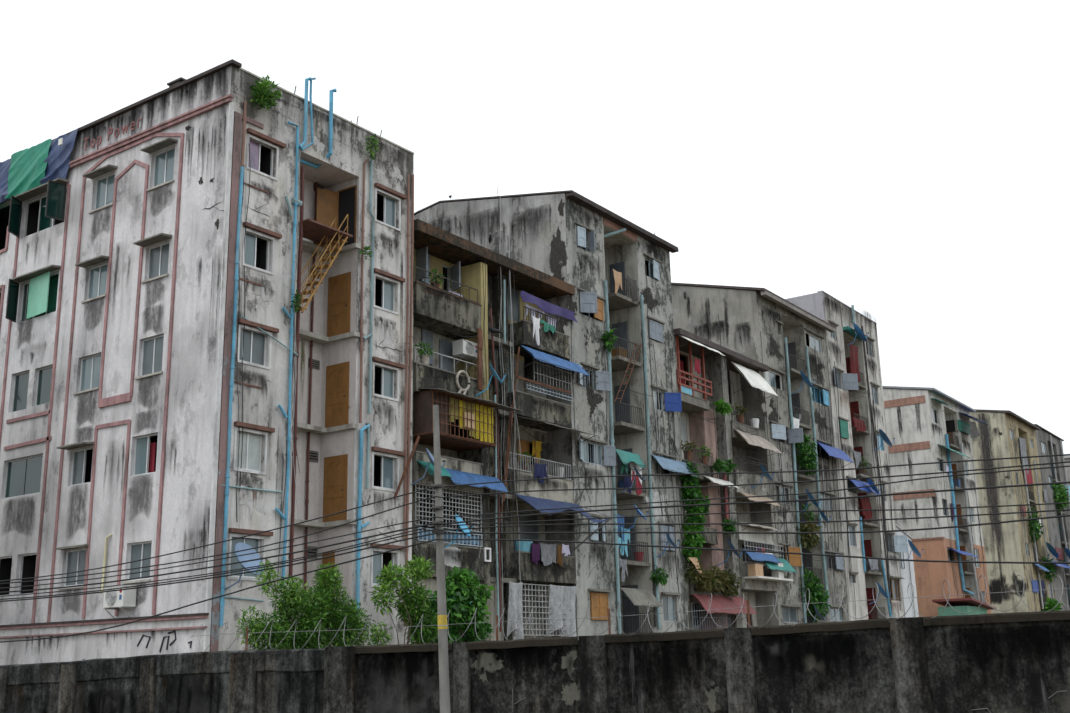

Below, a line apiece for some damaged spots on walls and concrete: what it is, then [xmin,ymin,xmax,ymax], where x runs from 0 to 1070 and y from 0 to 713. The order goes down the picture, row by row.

damp [83,96,166,146]
damp [92,208,109,239]
damp [434,208,551,246]
damp [86,298,104,327]
damp [695,302,749,339]
damp [768,336,783,361]
damp [68,487,86,537]
damp [129,476,150,513]
damp [963,414,1028,603]
peeling [469,652,504,682]
peeling [551,644,581,713]
peeling [700,680,724,713]